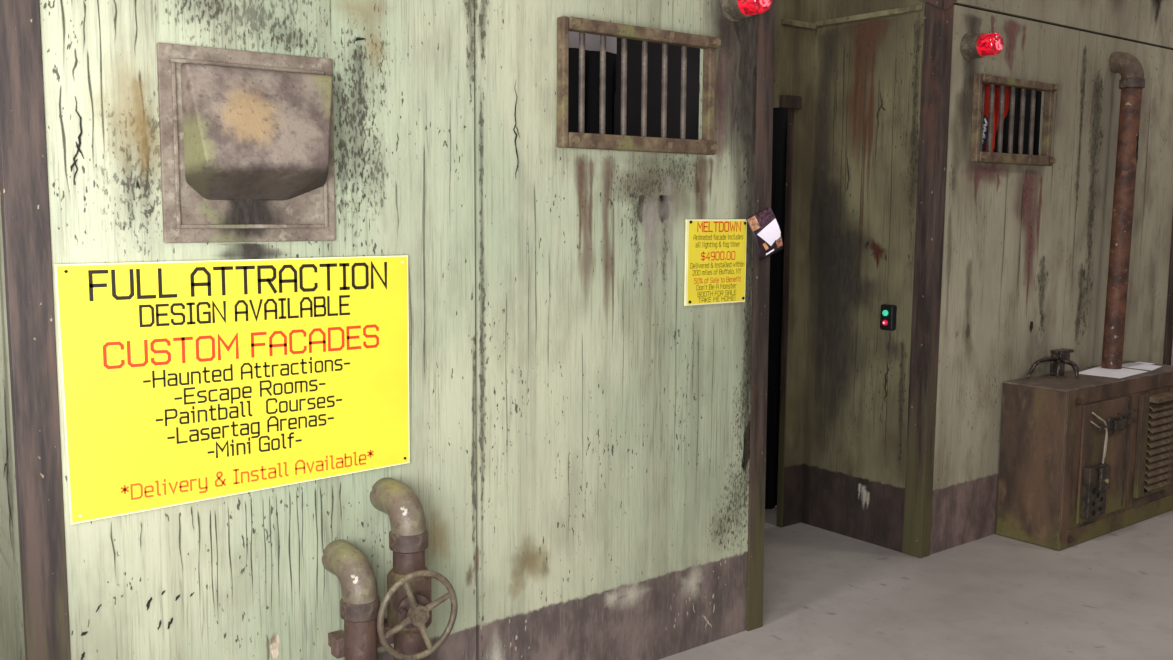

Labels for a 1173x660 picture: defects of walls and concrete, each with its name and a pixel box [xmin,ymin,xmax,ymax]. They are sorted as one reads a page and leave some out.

leakage [59,87,69,190]
crack [70,97,84,181]
leakage [60,0,104,152]
leakage [122,72,157,233]
leakage [225,199,274,259]
leakage [333,41,399,234]
leakage [409,153,425,360]
crack [512,82,520,178]
rust [578,161,614,289]
rust [698,159,712,212]
rust [1023,171,1042,298]
crack [3,383,13,546]